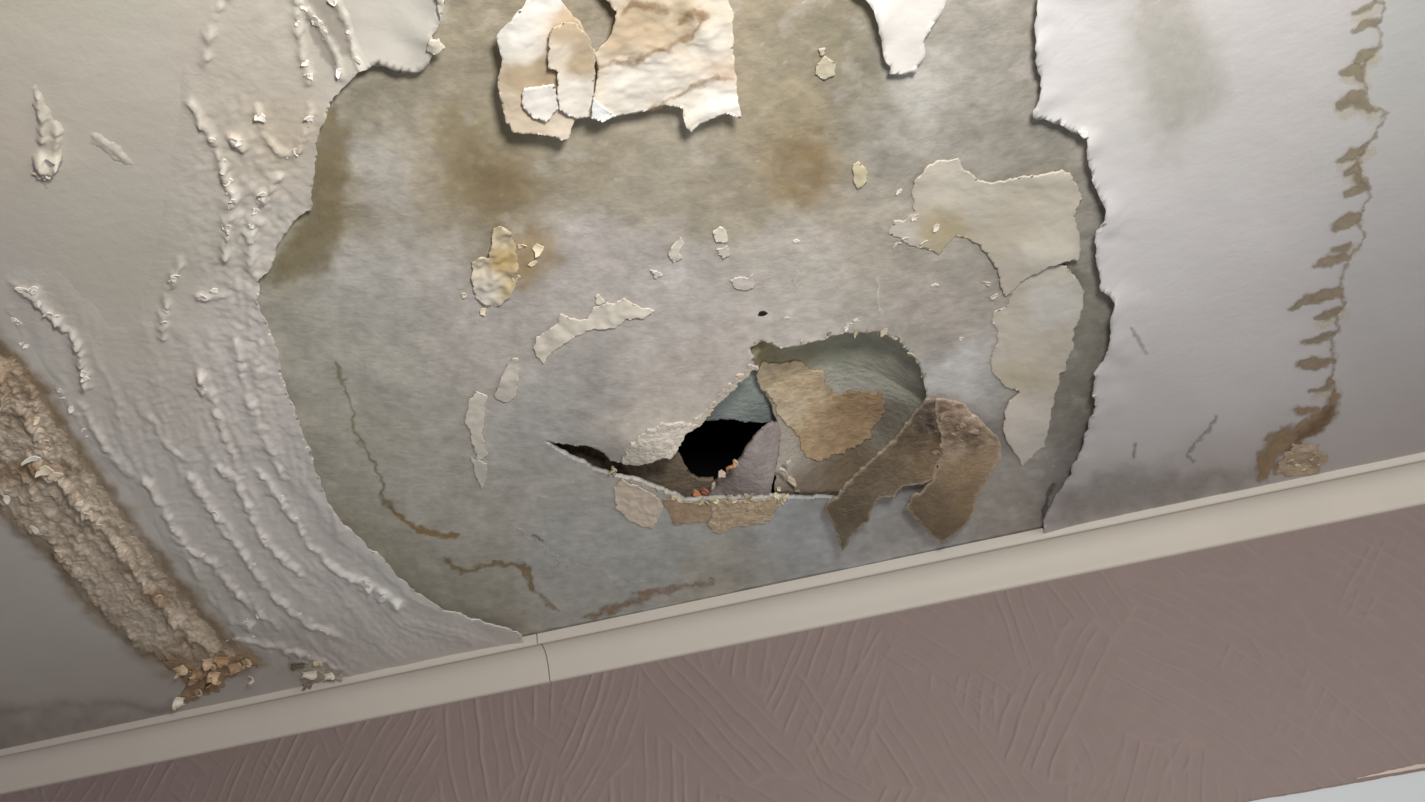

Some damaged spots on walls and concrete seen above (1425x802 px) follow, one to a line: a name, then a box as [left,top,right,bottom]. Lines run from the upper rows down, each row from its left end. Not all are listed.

damp [0,346,109,493]
flaking render [0,352,254,710]
damp [152,556,249,653]
crack [371,460,558,610]
peeling [257,0,1115,637]
damp [1257,0,1387,481]